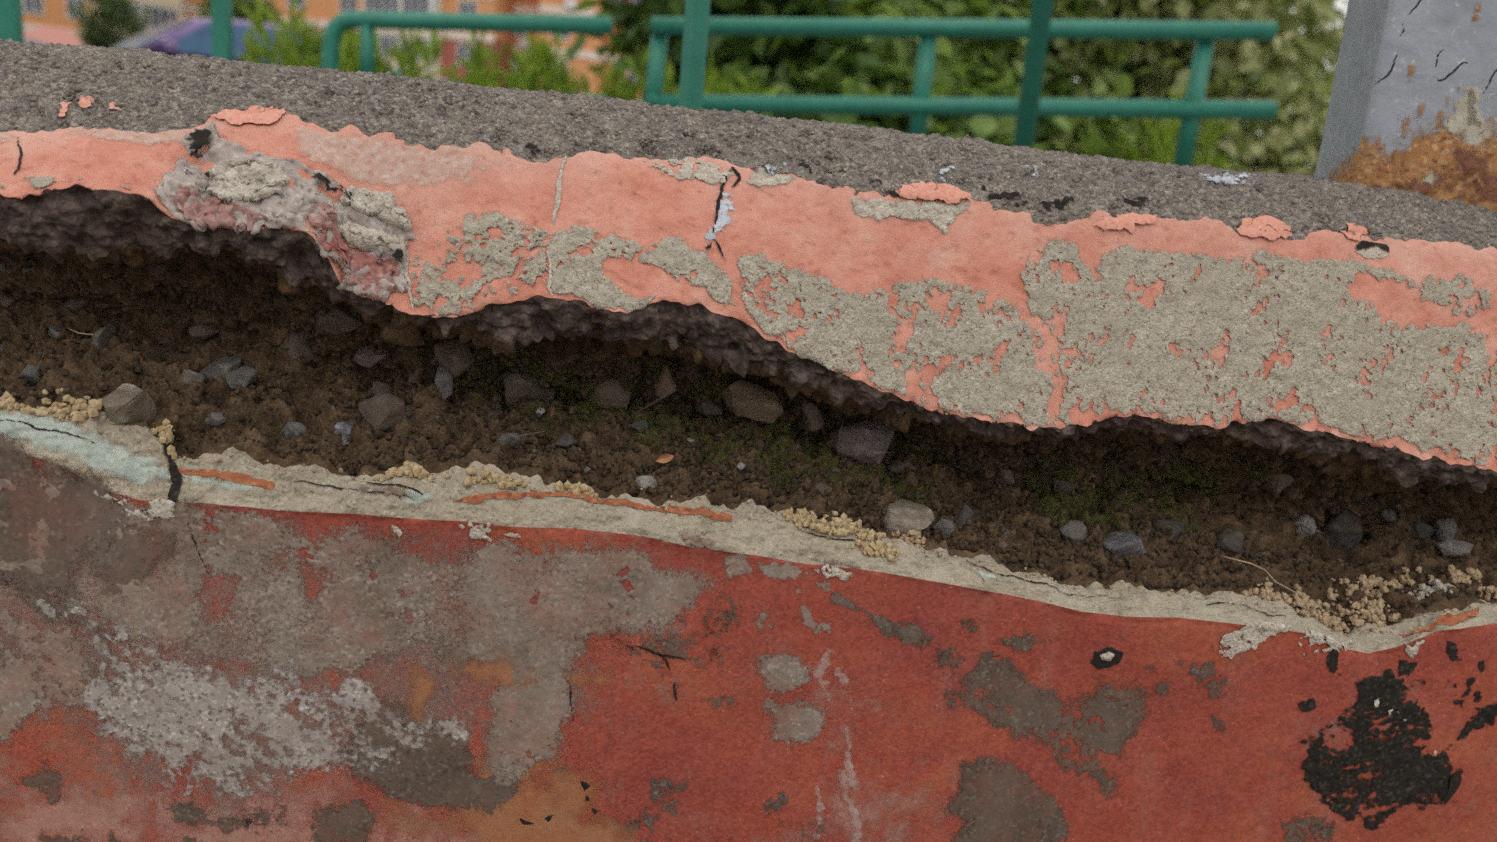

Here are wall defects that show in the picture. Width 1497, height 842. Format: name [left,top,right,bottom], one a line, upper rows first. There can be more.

crack [1377,0,1421,83]
crack [1436,49,1497,94]
rust [1328,86,1497,210]
crack [547,156,567,295]
crack [705,167,741,260]
crack [404,239,414,309]
spalling [0,120,1497,634]
crack [187,523,209,574]
peeling [0,391,1497,815]